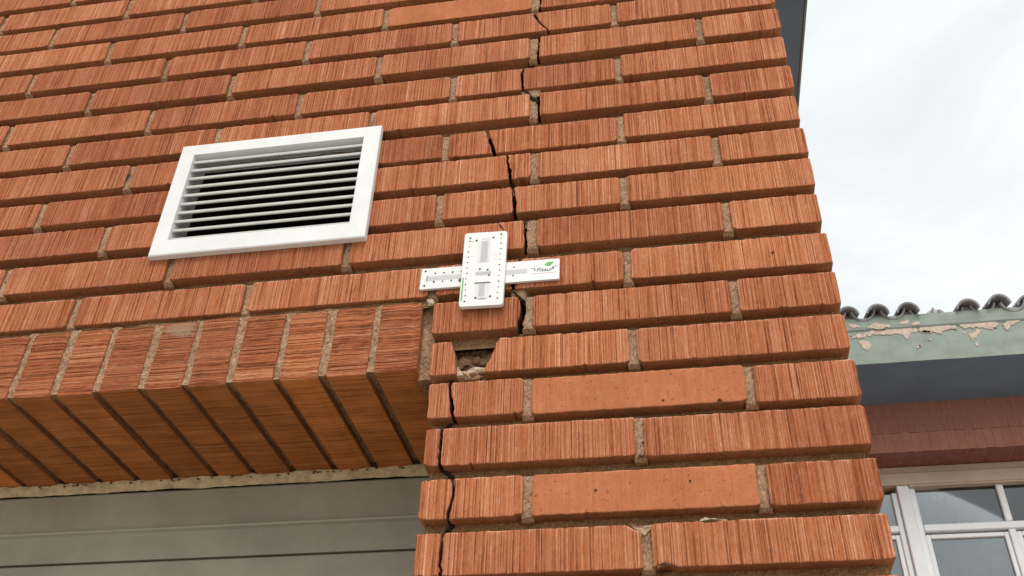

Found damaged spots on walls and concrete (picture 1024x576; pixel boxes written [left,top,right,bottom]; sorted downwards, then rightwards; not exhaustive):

crack [521,0,550,123]
crack [487,134,528,334]
spalling [457,350,493,382]
peeling [848,320,1020,351]
crack [438,380,457,576]